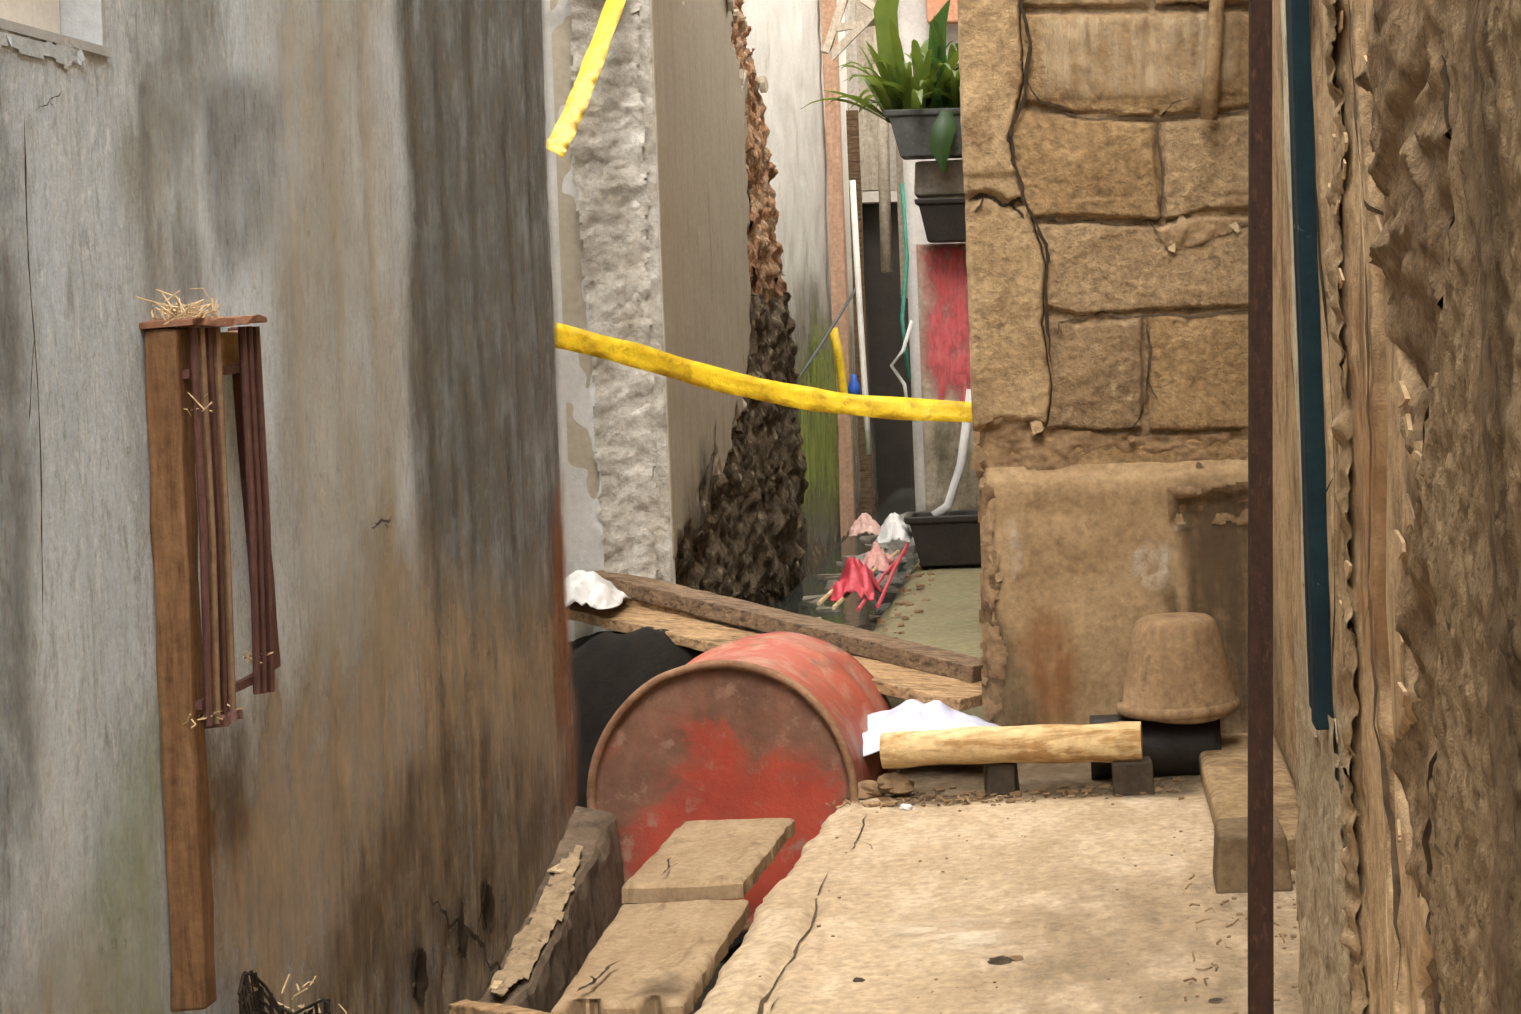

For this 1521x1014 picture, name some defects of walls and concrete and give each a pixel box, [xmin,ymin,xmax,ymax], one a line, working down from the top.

peeling [0,29,85,69]
spalling [568,0,652,347]
spalling [727,0,785,292]
crack [968,0,1248,432]
damp [212,0,575,1014]
spalling [591,357,660,579]
spalling [1294,0,1454,1014]
crack [757,816,872,1014]